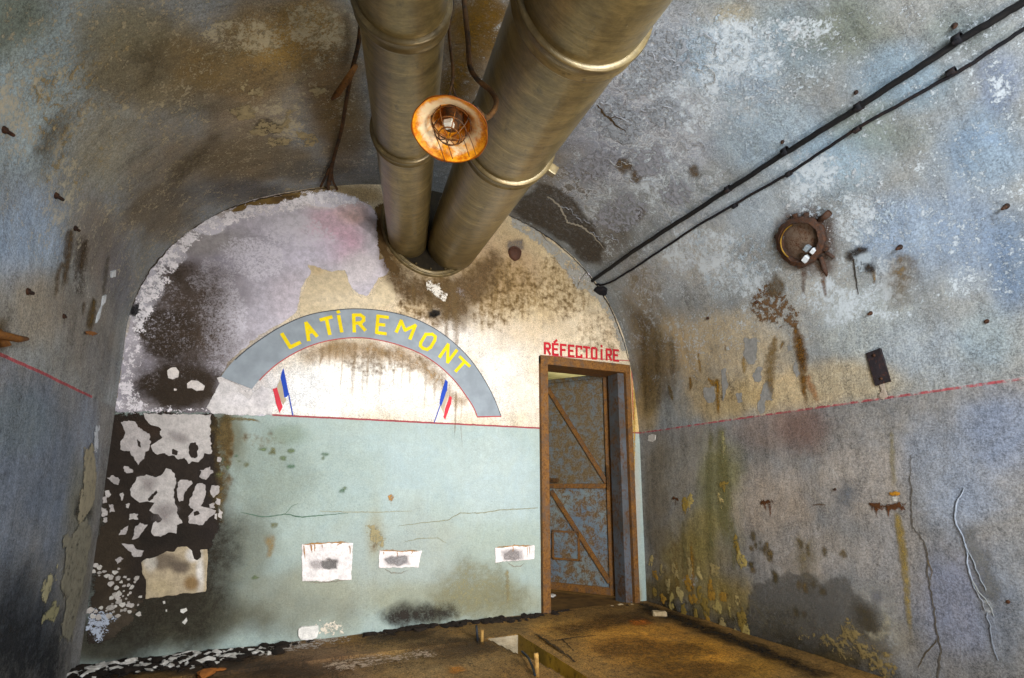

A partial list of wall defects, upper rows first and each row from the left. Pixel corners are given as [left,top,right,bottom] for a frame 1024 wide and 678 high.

leakage [56,230,87,292]
leakage [83,299,96,329]
peeling [41,192,400,644]
leakage [116,189,368,511]
leakage [324,343,444,384]
crack [509,215,629,359]
rust [750,284,816,397]
crack [242,503,531,543]
leakage [648,532,896,678]
peeling [798,618,898,678]
rust [869,491,911,623]
crack [909,455,942,678]